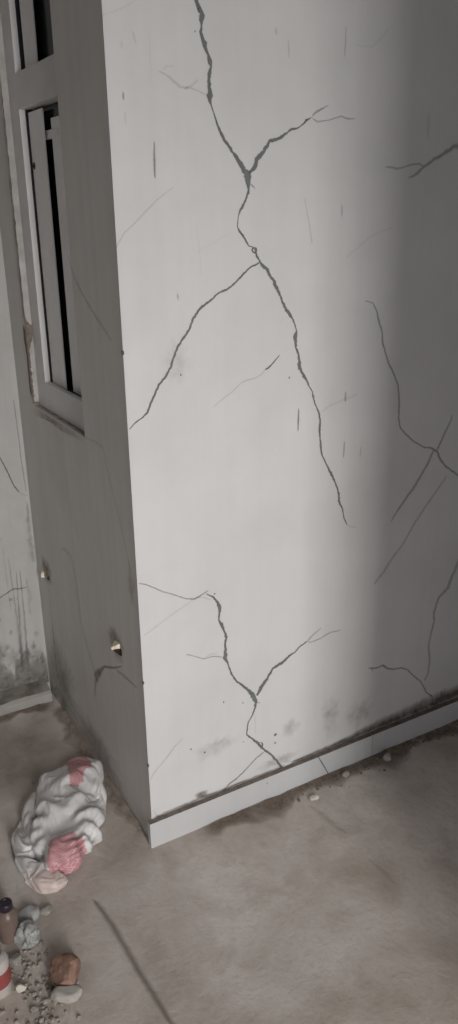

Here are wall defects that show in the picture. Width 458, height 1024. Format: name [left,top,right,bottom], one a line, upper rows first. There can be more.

crack [130,0,347,524]
crack [207,594,306,789]